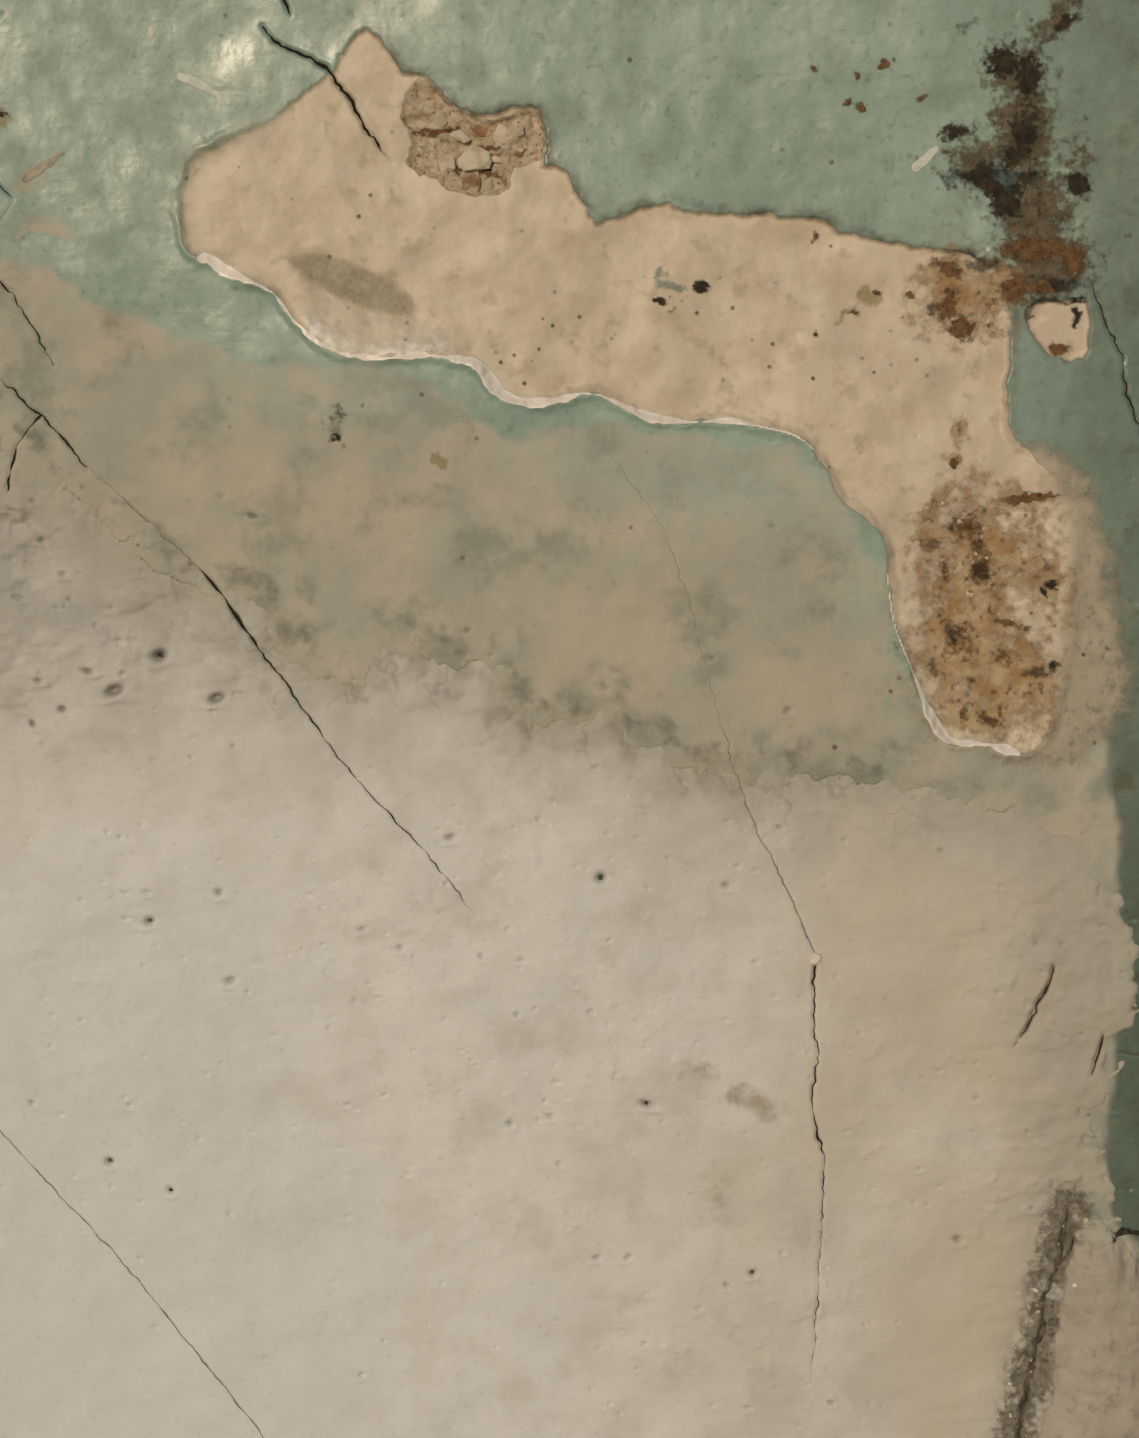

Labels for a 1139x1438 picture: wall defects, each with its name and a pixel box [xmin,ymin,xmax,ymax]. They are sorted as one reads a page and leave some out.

crack [0,281,53,365]
crack [262,0,391,160]
peeling [181,28,1131,763]
rust [842,99,866,112]
rust [905,0,1106,362]
crack [1089,277,1139,425]
crack [0,378,471,910]
rust [904,422,1076,736]
crack [607,450,825,1374]
crack [1013,966,1054,1047]
crack [0,1130,263,1438]